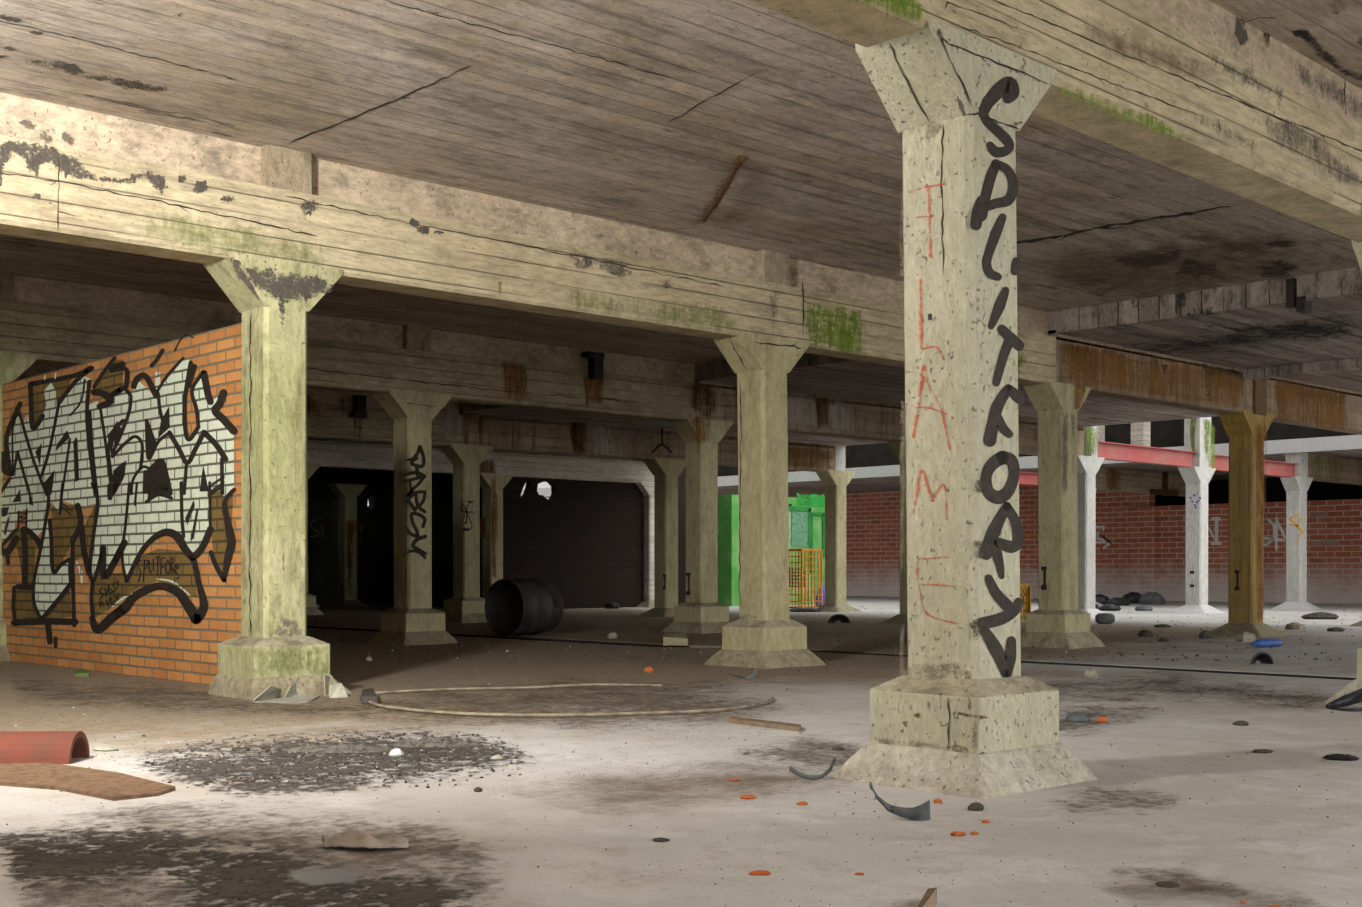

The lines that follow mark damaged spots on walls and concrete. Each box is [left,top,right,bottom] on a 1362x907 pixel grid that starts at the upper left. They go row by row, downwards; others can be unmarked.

crack [290,65,472,143]
crack [889,0,1362,267]
spalling [231,257,259,300]